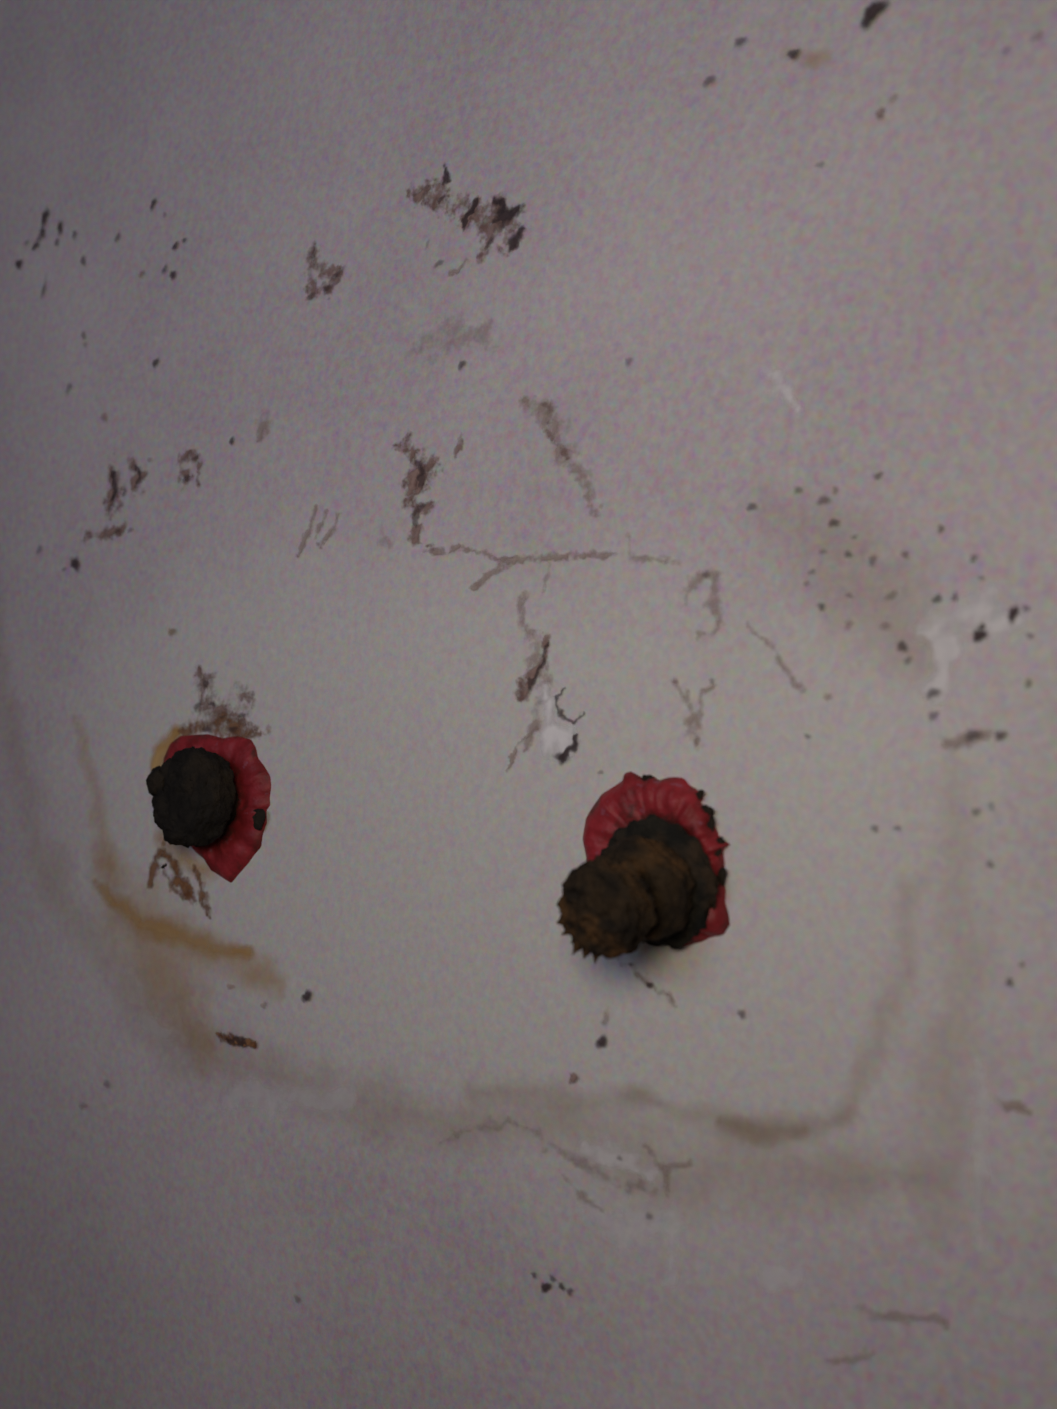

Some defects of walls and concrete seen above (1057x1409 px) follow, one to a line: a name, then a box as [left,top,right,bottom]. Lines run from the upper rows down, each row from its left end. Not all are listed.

corrosion [556,919,600,964]